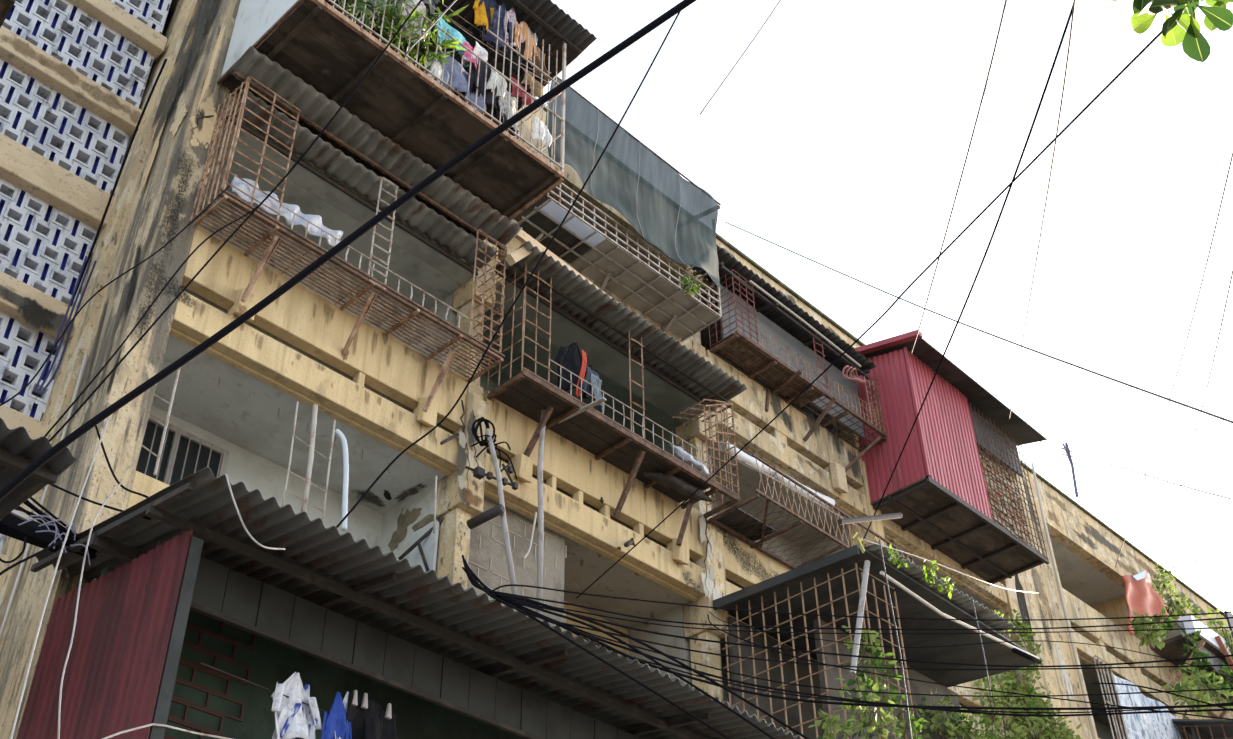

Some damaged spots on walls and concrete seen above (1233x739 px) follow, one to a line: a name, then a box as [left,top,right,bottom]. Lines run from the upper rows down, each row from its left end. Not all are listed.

water stain [5,37,138,122]
water stain [151,0,221,142]
water stain [0,285,74,335]
water stain [80,147,195,405]
flaking render [388,508,441,552]